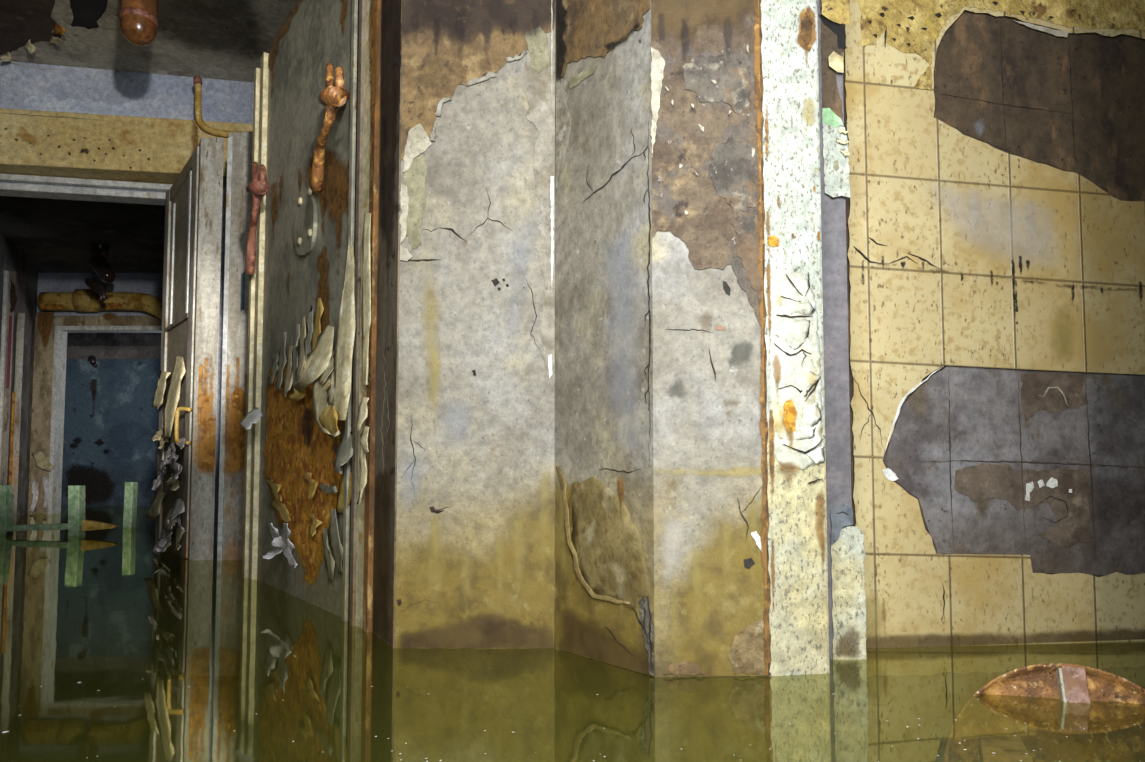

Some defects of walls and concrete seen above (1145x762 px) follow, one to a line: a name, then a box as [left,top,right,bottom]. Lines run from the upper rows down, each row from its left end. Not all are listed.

corrosion [198,358,247,472]
corrosion [298,150,349,332]
crack [401,256,441,264]
crack [422,189,511,242]
damp [379,0,567,265]
crack [582,122,716,473]
peeling [539,0,761,325]
corrosion [754,0,798,675]
peeling [819,0,1145,202]
peeling [882,366,1145,576]
damp [373,474,654,677]
damp [677,519,768,676]